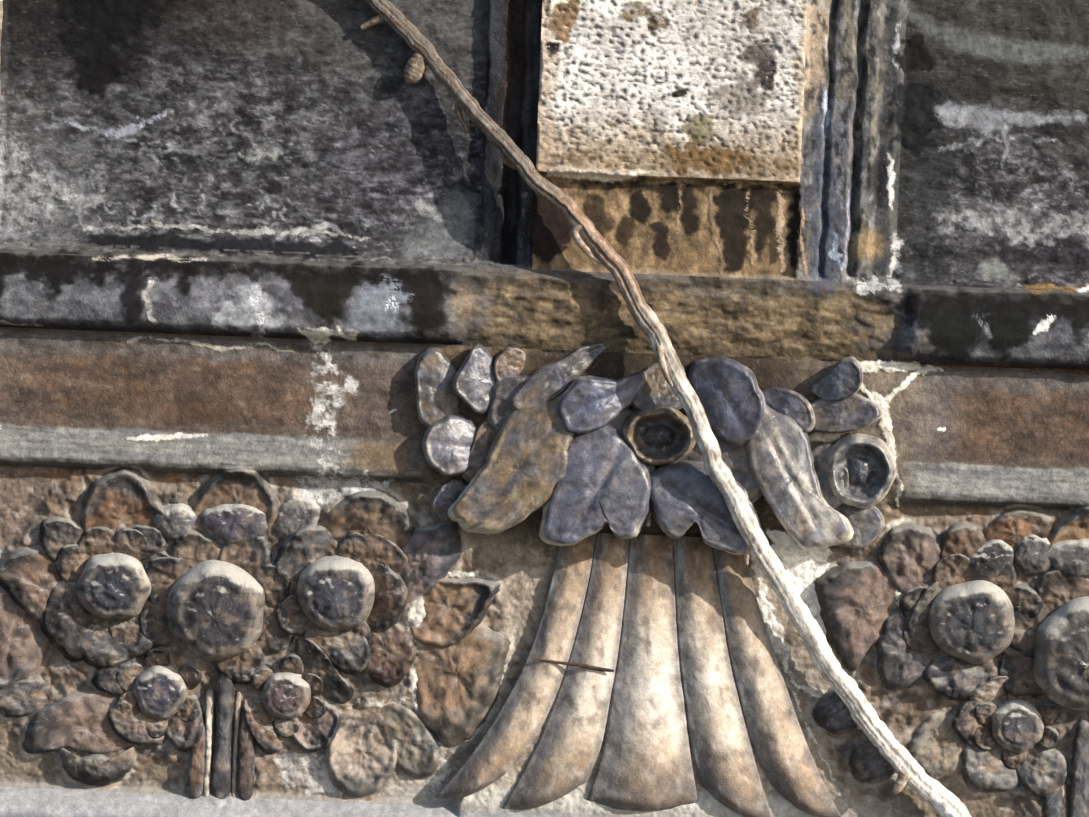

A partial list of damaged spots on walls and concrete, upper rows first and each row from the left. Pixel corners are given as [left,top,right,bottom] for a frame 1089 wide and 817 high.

damp [882,0,1089,65]
damp [55,109,174,139]
damp [936,102,1085,169]
damp [546,90,850,291]
damp [524,192,572,263]
damp [937,209,1089,247]
damp [0,132,477,511]
damp [858,248,1089,507]